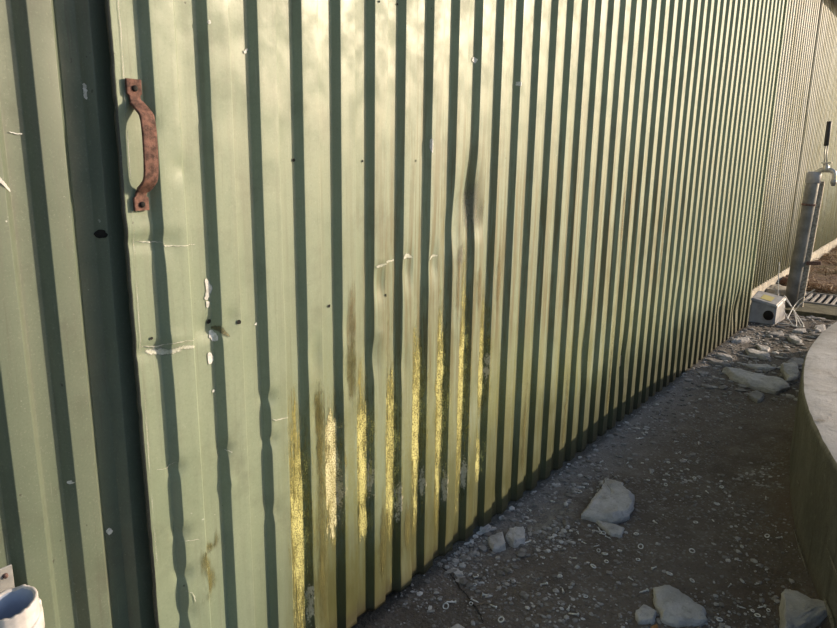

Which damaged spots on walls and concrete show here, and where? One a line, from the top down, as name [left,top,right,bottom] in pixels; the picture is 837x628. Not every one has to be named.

peeling [204,279,213,308]
leakage [289,394,347,628]
leakage [347,346,375,538]
leakage [380,257,491,576]